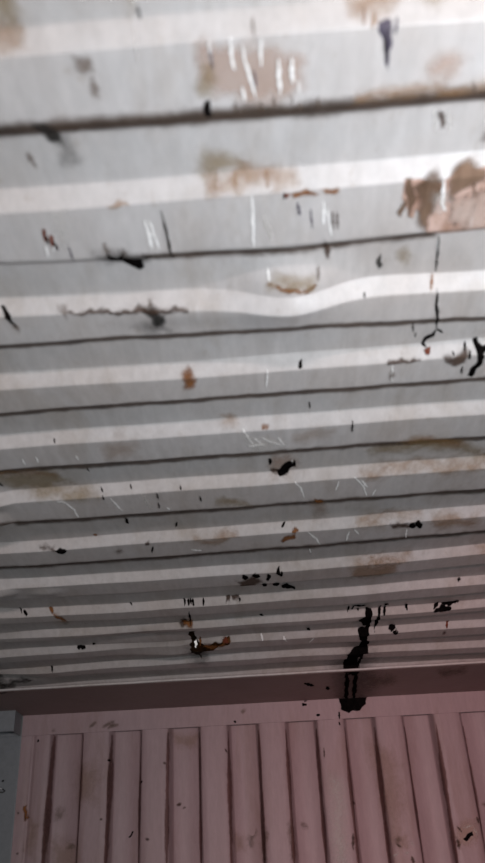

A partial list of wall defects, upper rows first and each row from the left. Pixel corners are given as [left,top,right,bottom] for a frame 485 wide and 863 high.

rust [267,267,319,294]
crack [421,236,443,355]
rust [0,358,485,416]